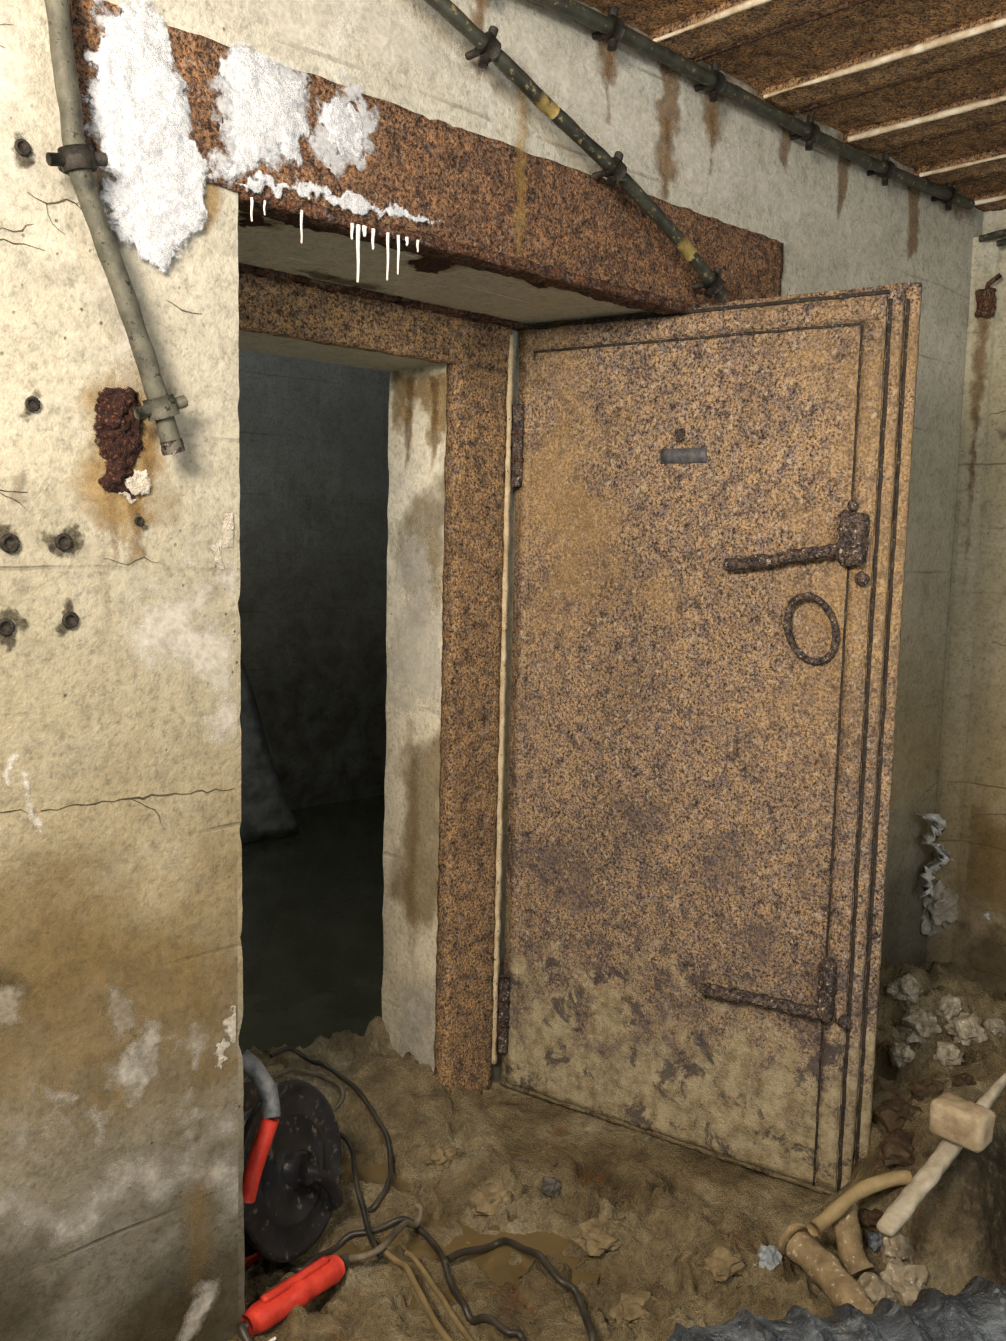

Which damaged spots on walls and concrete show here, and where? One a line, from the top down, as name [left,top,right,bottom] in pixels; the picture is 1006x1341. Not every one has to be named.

damp [83,0,440,283]
corrosion [659,64,679,195]
corrosion [837,135,850,214]
crack [0,192,81,251]
corrosion [908,186,920,256]
corrosion [128,418,155,474]
corrosion [86,439,150,549]
crack [0,788,235,829]
damp [0,980,23,1024]
damp [109,988,159,1088]
damp [1,1164,238,1237]
damp [122,1268,217,1341]